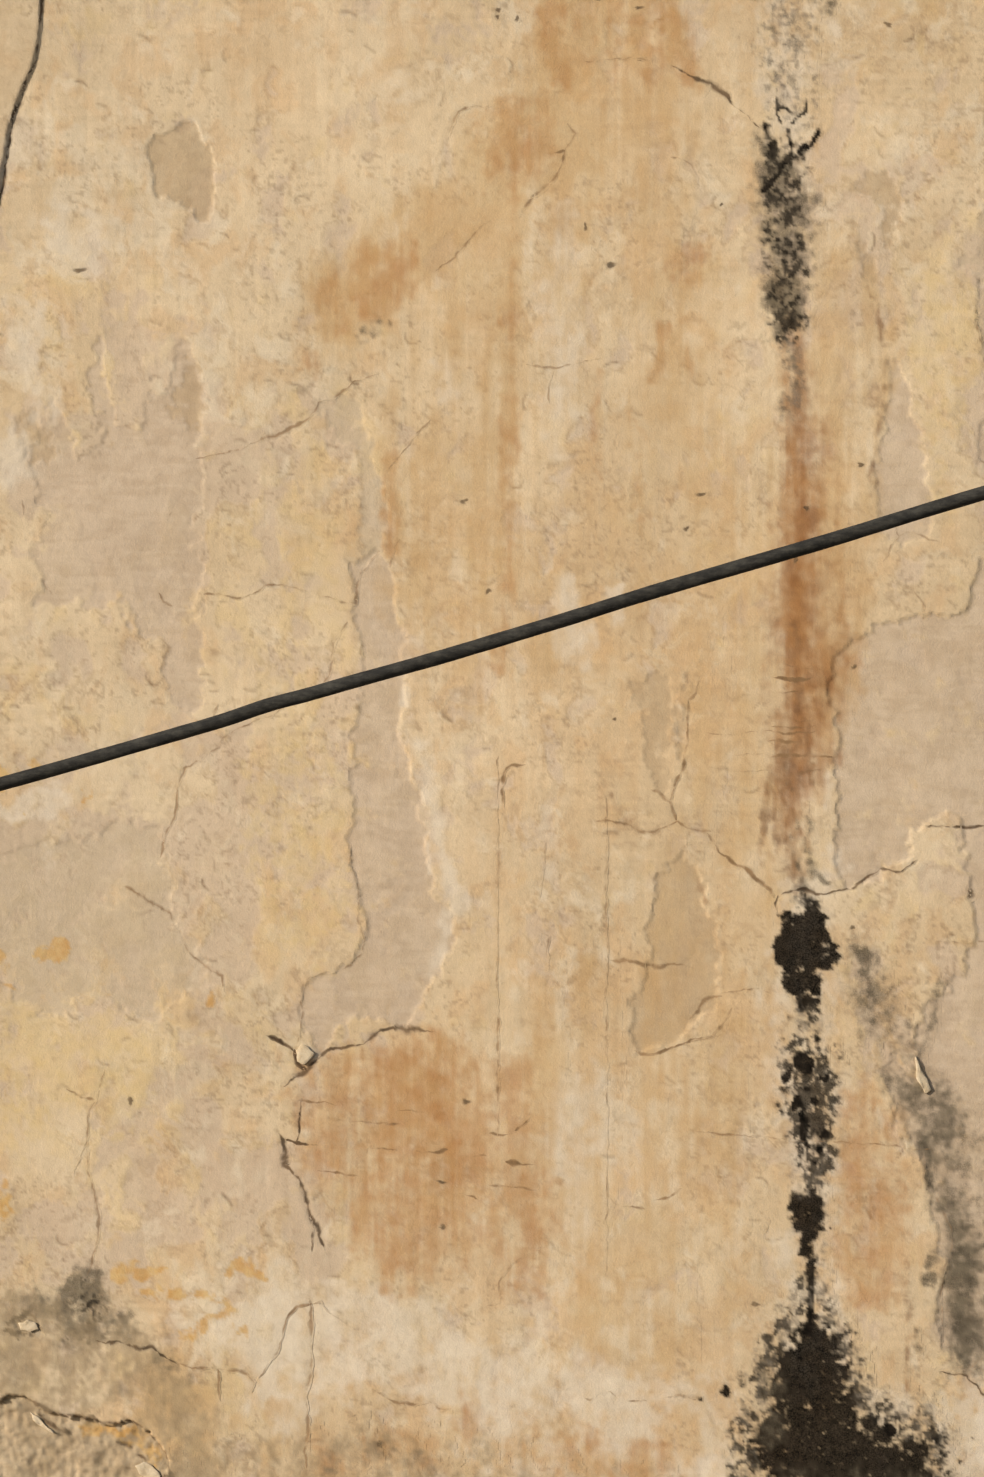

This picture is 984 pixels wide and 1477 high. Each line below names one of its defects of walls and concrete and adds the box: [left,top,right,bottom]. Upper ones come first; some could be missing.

crack [0,0,45,207]
damp [289,0,984,664]
corrosion [752,332,869,895]
corrosion [861,284,893,501]
spalling [0,1408,163,1477]
crack [265,757,536,1252]
damp [28,567,984,1477]
crack [594,662,984,1275]
crack [696,1131,984,1397]